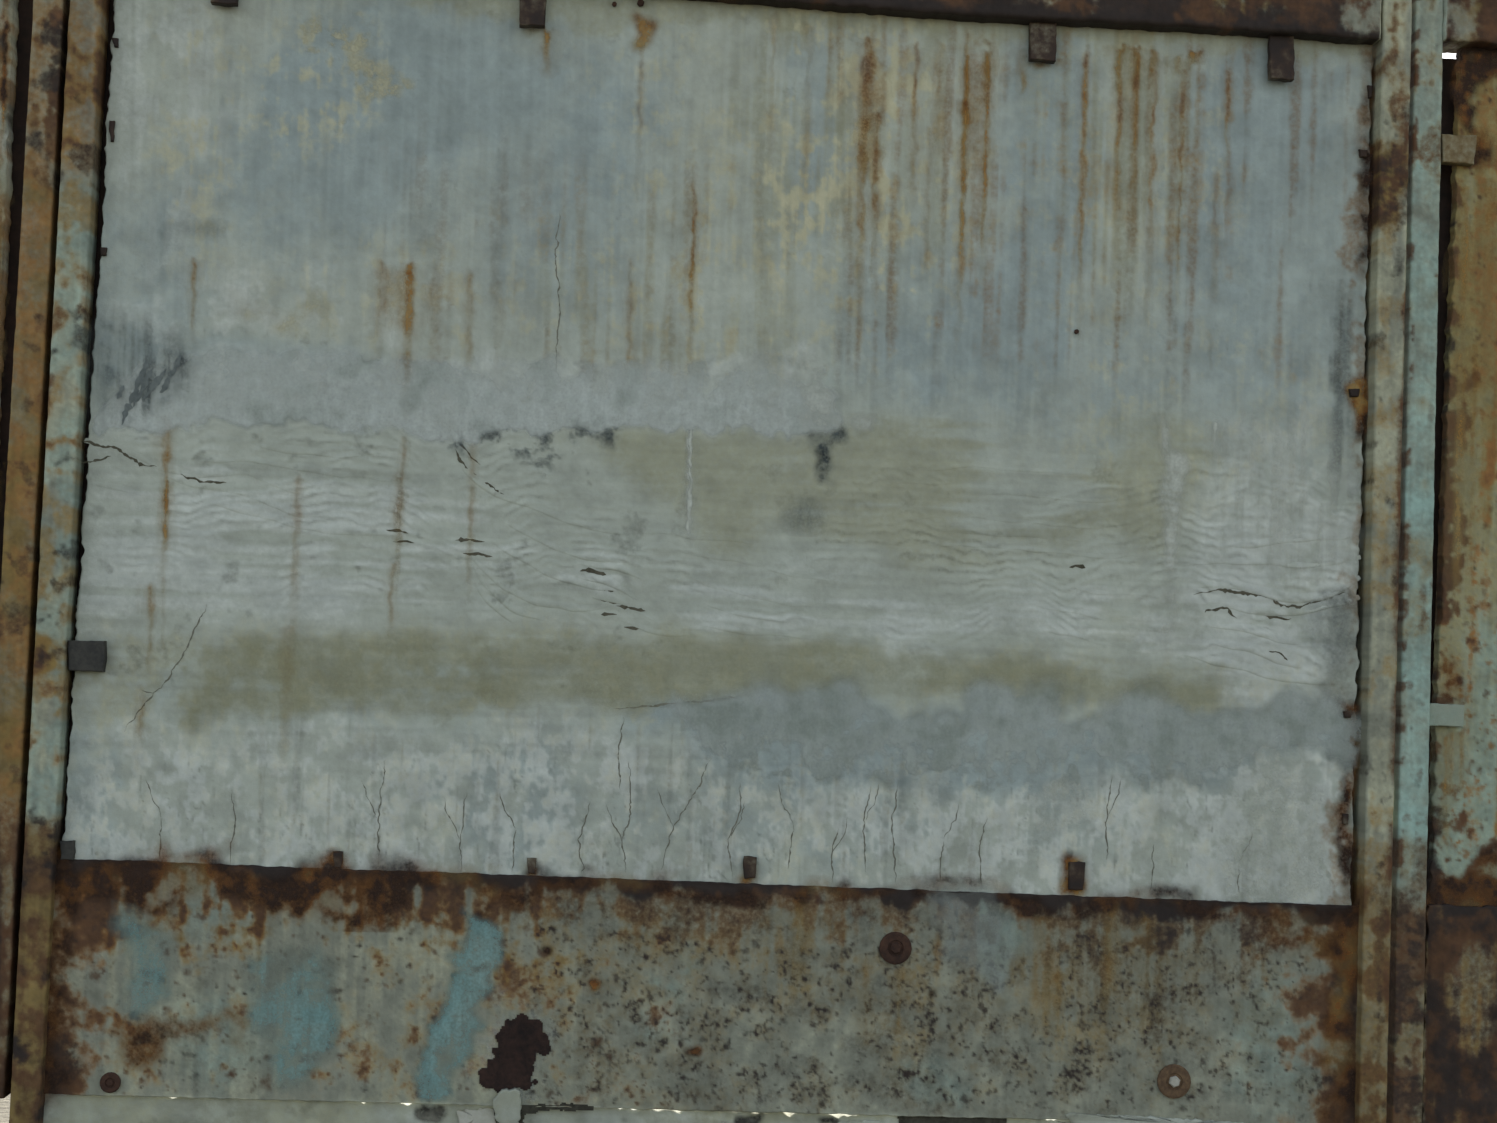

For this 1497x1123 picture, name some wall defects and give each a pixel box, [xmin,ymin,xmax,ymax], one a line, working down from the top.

rust [1452,49,1497,160]
rust [959,54,991,269]
rust [403,263,414,334]
damp [93,343,870,533]
crack [1194,588,1344,660]
damp [675,678,1361,786]
crack [578,696,736,871]
crack [444,796,516,869]
crack [831,786,898,883]
rust [55,848,441,932]
rust [1061,855,1224,920]
spalling [722,1114,761,1123]